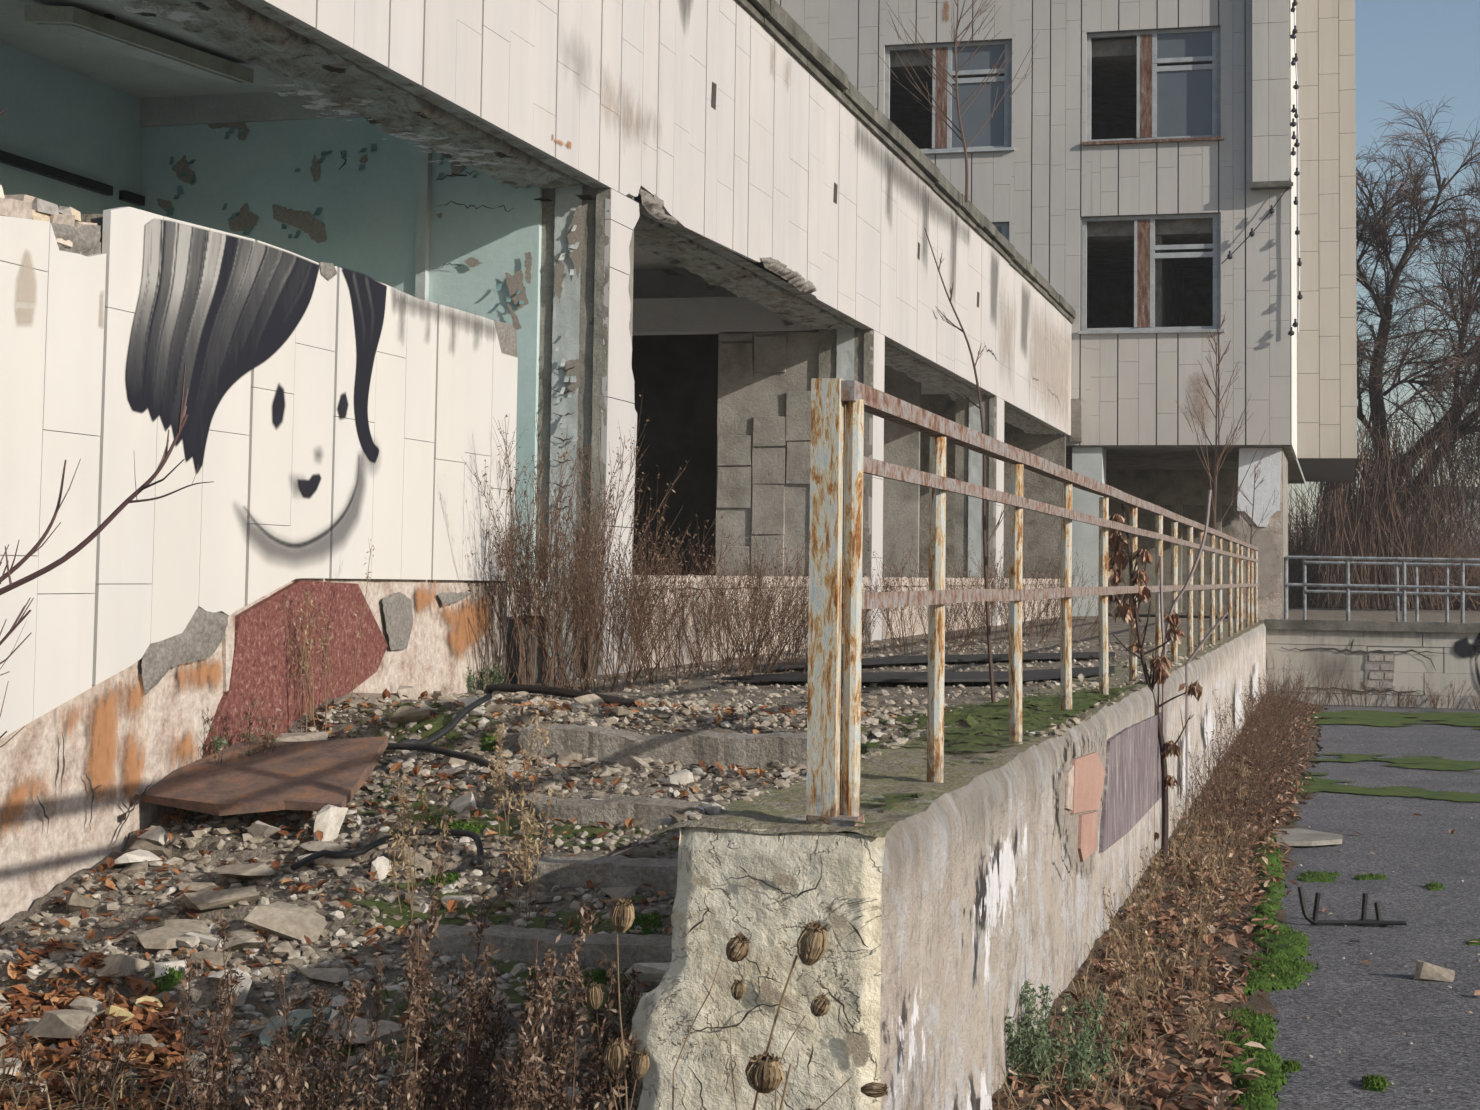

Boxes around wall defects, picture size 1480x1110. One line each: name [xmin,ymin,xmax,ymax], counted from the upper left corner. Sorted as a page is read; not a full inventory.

flaking render [0,185,102,256]
peeling [495,252,532,357]
peeling [554,205,586,303]
spalling [761,257,817,294]
leakage [885,157,957,287]
crack [684,856,823,937]
crack [839,920,869,953]
peeling [972,827,1027,986]
crack [680,957,862,1073]
peeling [889,972,925,1096]
crack [688,1067,707,1110]
peeling [933,1070,1002,1110]